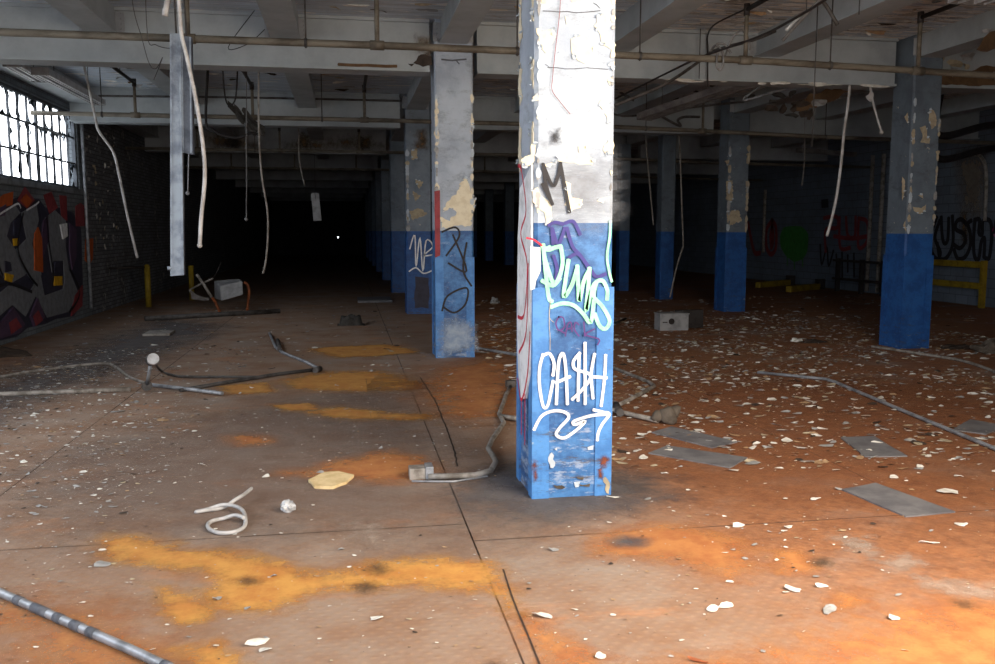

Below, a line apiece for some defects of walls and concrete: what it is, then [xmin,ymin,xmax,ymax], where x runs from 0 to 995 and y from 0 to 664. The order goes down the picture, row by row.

spalling [409,54,433,67]
peeling [440,0,614,228]
peeling [405,149,427,231]
peeling [724,146,750,232]
peeling [902,98,942,234]
rust [220,327,517,420]
rust [100,535,512,624]
rust [592,524,753,578]
rust [777,551,817,575]
rust [183,641,239,664]